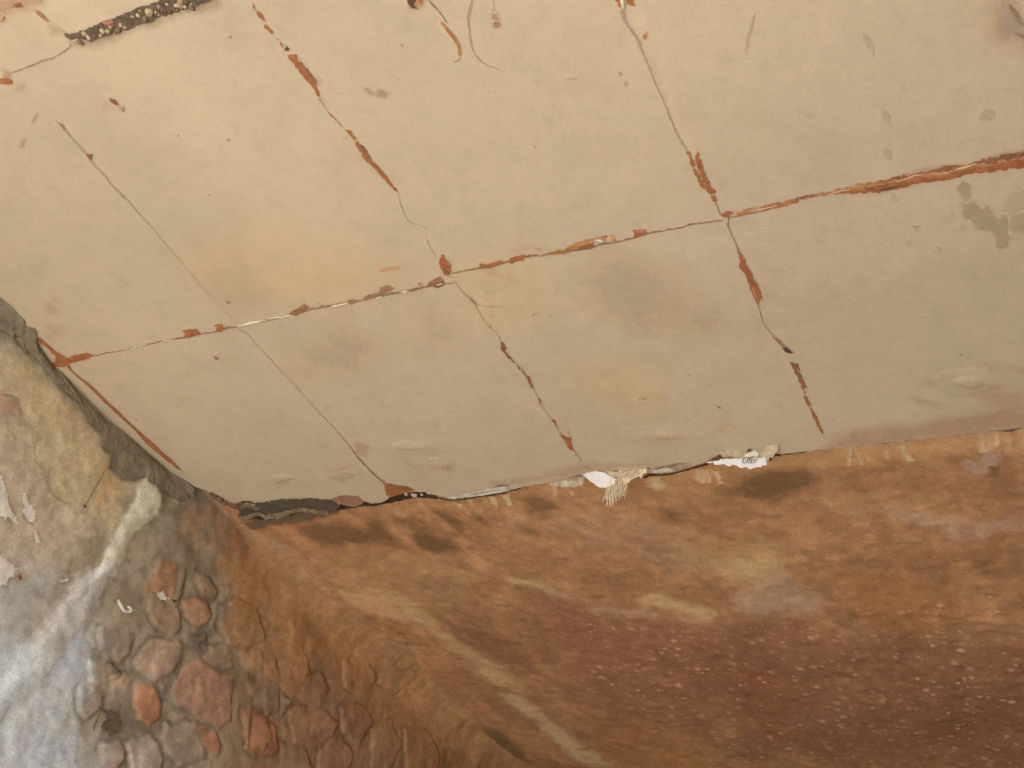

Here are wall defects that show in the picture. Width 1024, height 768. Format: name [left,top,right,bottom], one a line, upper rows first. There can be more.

spalling [0,0,217,85]
crack [37,0,1024,484]
crack [1,393,106,508]
peeling [0,475,41,544]
spalling [209,492,364,521]
peeling [384,484,414,497]
peeling [0,556,26,586]